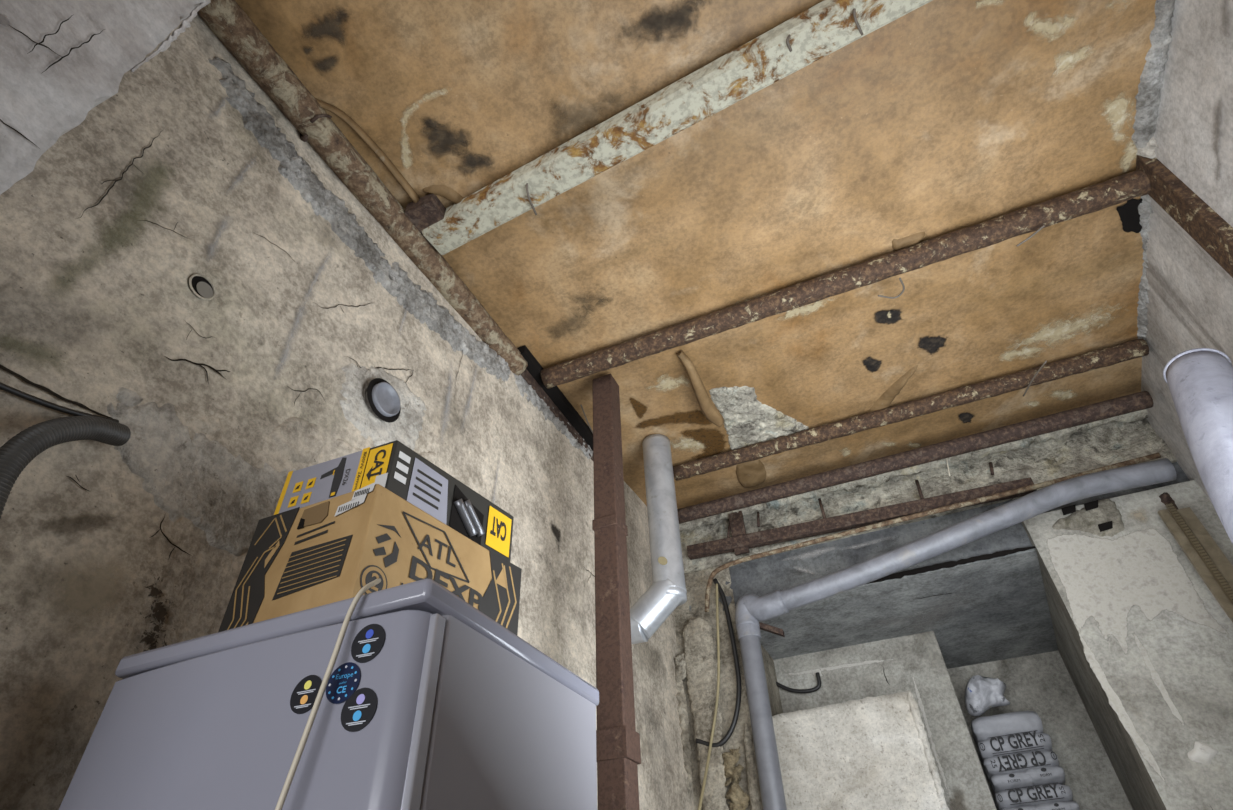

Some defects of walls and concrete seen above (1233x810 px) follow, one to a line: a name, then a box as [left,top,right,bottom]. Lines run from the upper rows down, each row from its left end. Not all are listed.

crack [9,15,105,73]
mould [304,10,348,72]
leakage [624,0,703,41]
leakage [401,89,493,173]
crack [0,364,113,419]
spalling [676,350,809,450]
peeling [867,365,918,413]
spalling [679,409,1148,538]